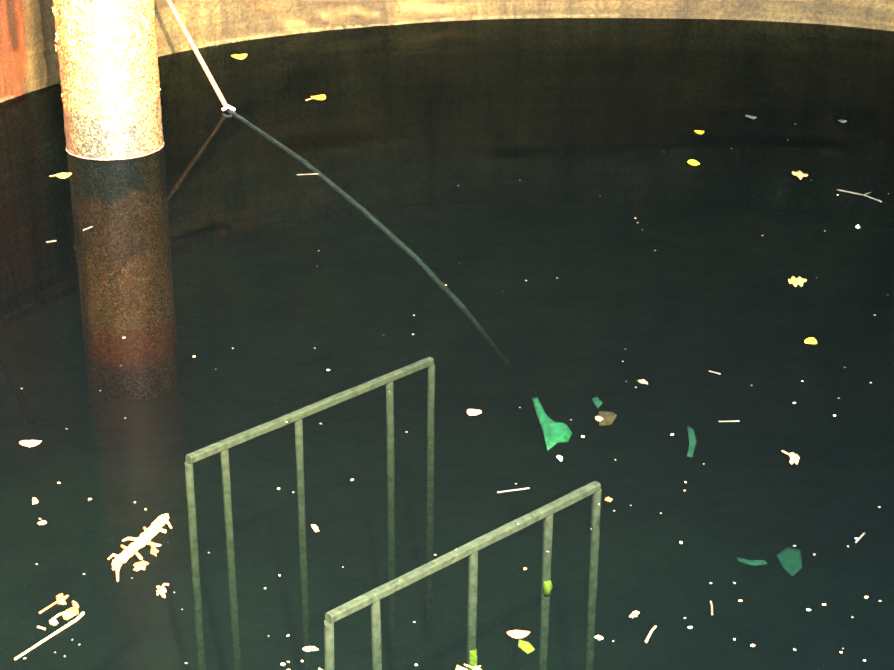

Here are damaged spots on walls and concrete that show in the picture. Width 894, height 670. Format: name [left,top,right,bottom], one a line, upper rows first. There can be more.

corrosion [0,0,45,108]